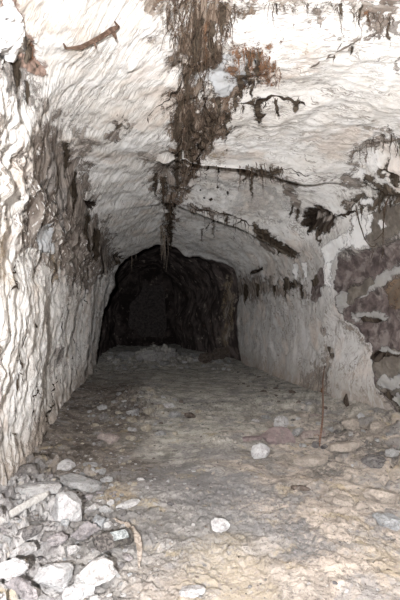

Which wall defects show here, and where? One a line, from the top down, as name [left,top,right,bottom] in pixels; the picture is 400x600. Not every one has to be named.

leakage [41,142,100,274]
leakage [142,0,266,248]
peeling [333,198,400,413]